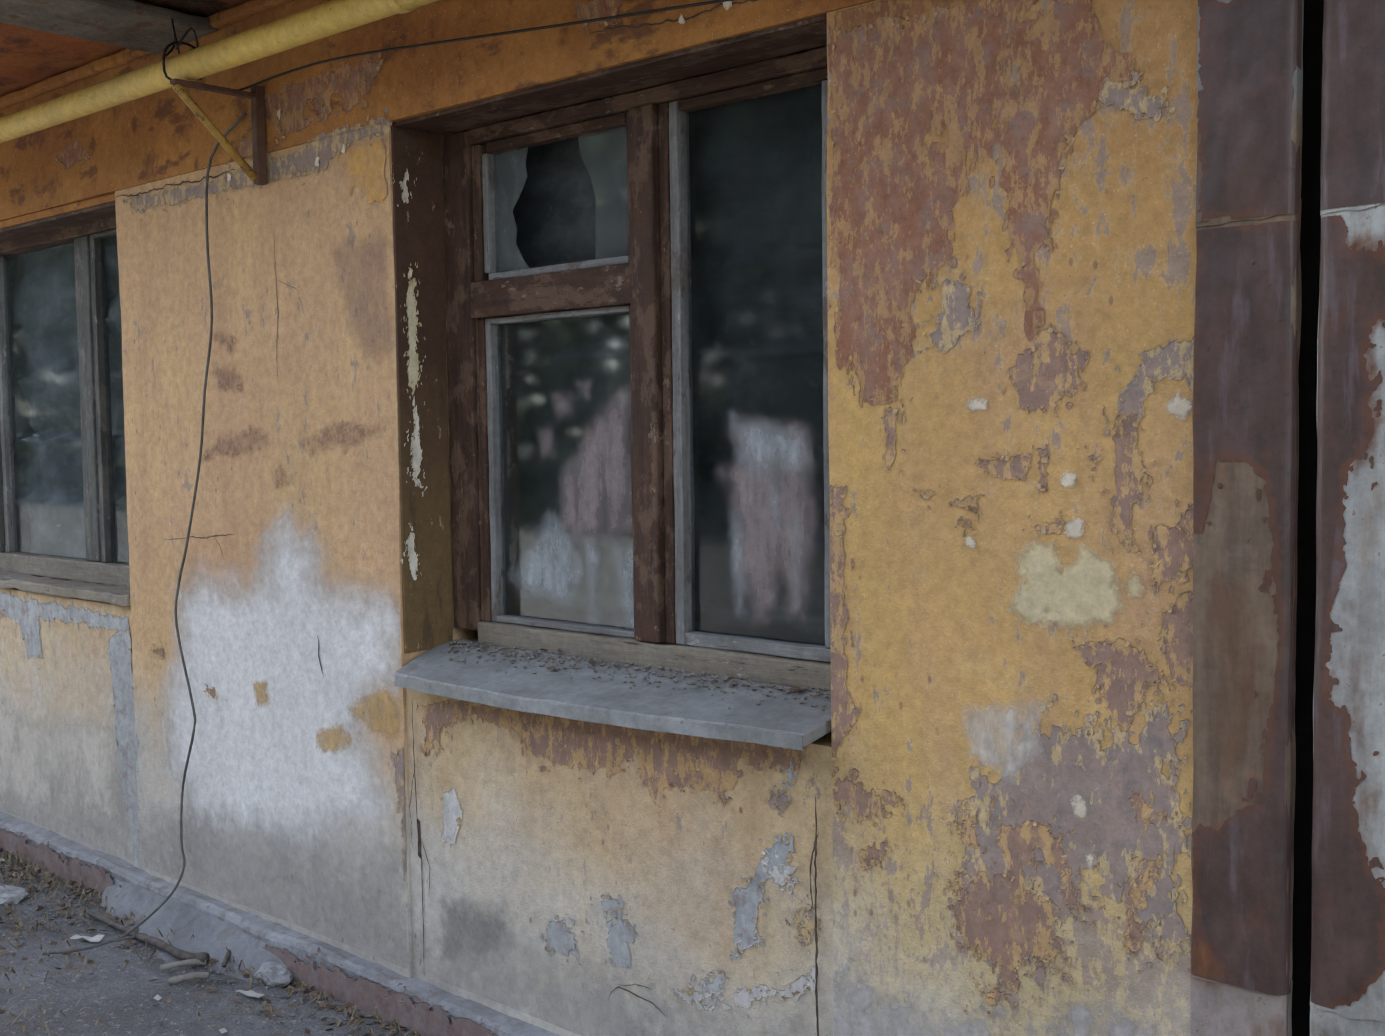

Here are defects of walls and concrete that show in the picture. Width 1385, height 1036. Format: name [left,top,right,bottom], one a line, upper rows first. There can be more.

peeling [123,43,417,225]
peeling [400,262,428,497]
peeling [827,0,1175,549]
peeling [0,828,122,895]
flaking render [0,591,131,670]
peeling [254,682,267,705]
peeling [317,727,351,752]
peeling [400,523,421,580]
peeling [354,690,825,1019]
peeling [830,480,906,873]
peeling [933,0,1302,1019]
peeling [1310,0,1385,1009]